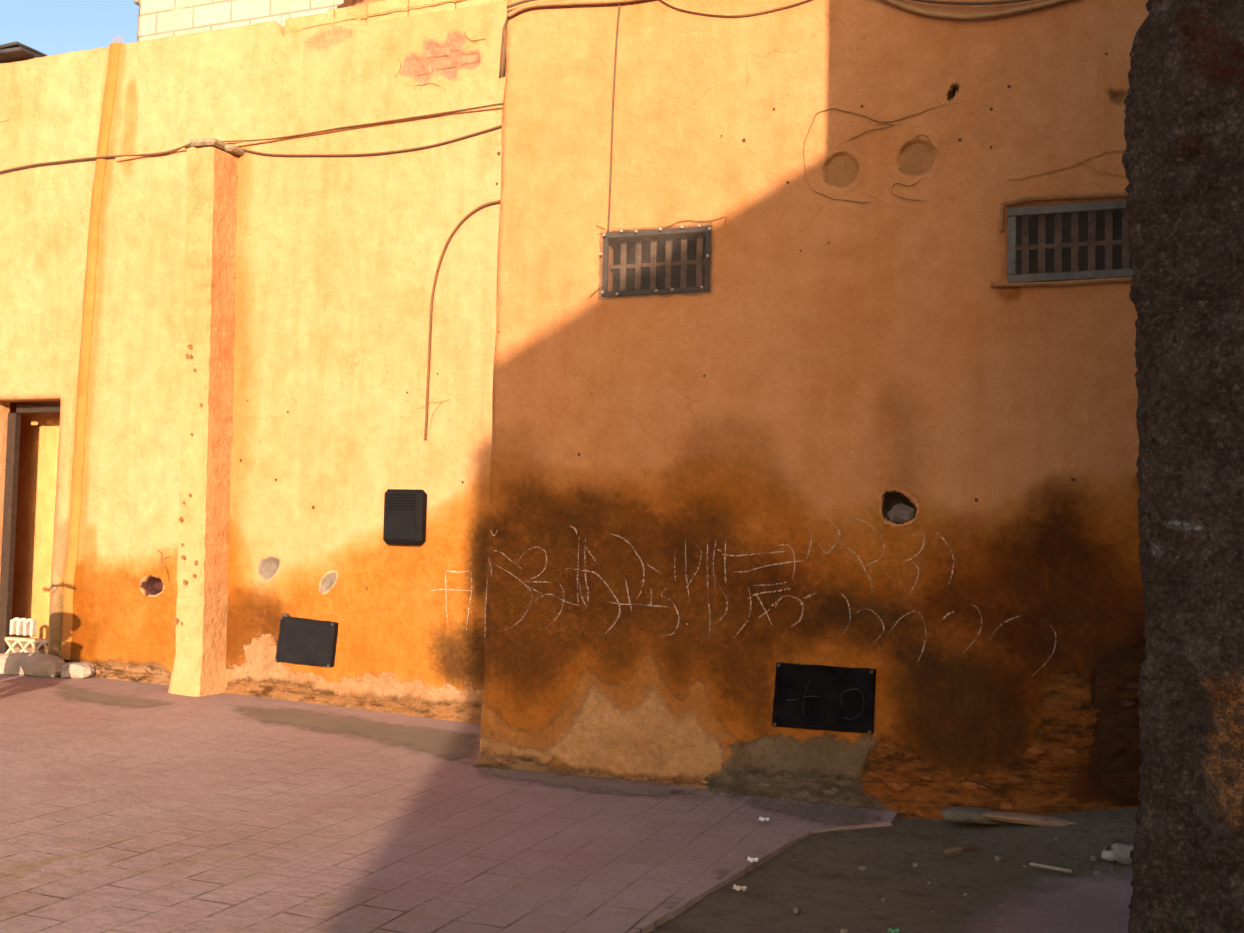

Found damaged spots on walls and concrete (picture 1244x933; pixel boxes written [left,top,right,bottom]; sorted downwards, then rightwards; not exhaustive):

spalling [394,23,489,93]
spalling [225,676,482,725]
leakage [226,481,1146,783]
spalling [476,640,1146,826]